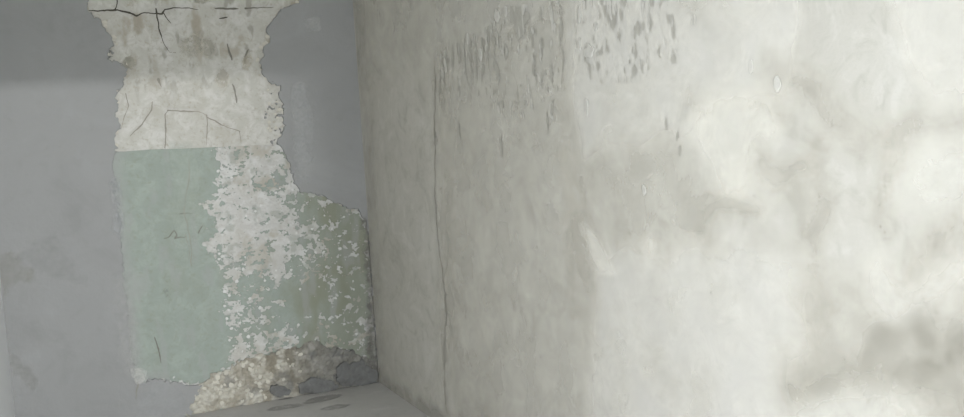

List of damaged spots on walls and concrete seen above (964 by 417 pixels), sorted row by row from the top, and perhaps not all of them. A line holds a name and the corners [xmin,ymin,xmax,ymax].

crack [89,0,273,53]
crack [121,78,241,148]
water stain [575,0,670,152]
peeling [87,0,377,416]
crack [434,62,454,411]
water stain [859,294,964,409]